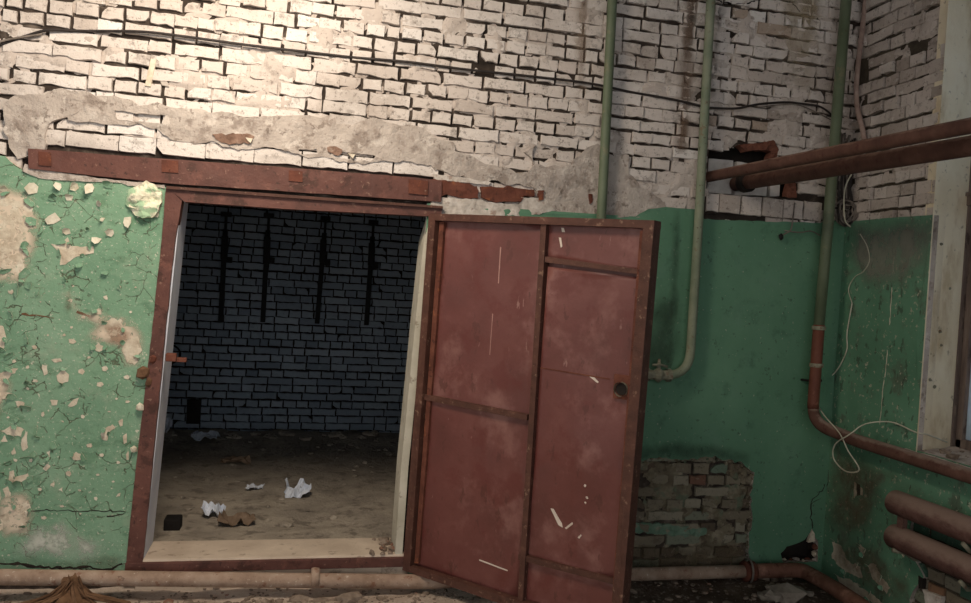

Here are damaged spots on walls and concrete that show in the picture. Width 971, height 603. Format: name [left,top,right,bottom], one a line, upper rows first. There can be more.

spalling [212,133,254,145]
spalling [327,146,355,159]
spalling [735,140,779,160]
corrosion [430,174,556,216]
peeling [0,181,114,302]
peeling [0,285,157,534]
crack [32,509,125,517]
spalling [632,456,759,567]
spalling [781,529,818,562]
peeling [830,538,890,603]
spalling [918,576,946,603]